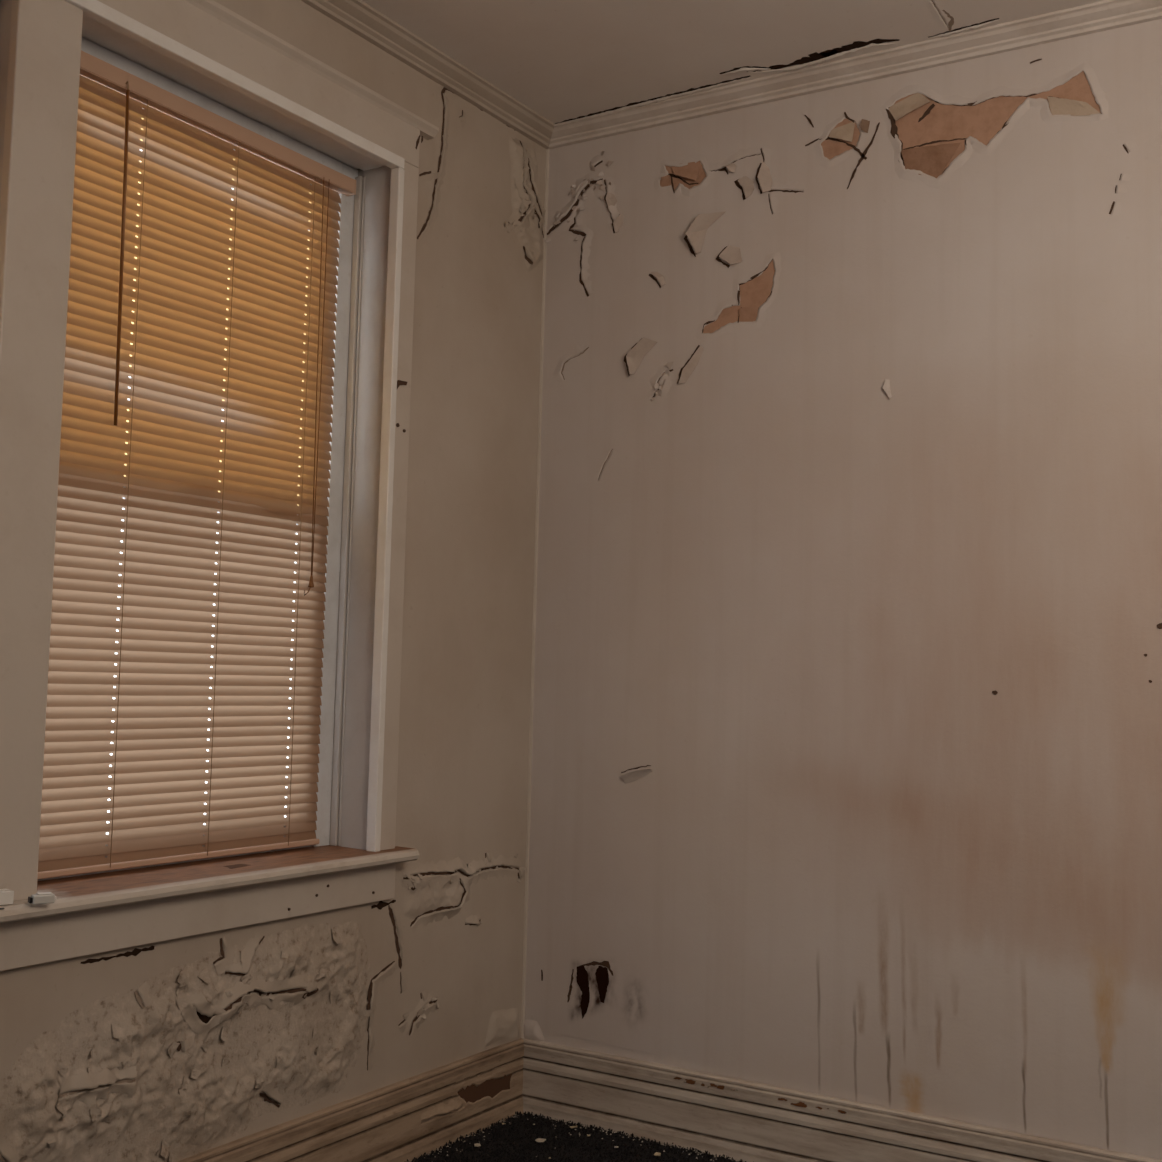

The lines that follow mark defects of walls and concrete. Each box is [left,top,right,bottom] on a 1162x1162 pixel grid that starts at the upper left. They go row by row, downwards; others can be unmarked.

crack [416,83,483,245]
peeling [684,212,725,257]
peeling [654,154,772,200]
crack [555,39,900,124]
peeling [805,62,1109,189]
crack [919,0,1002,39]
peeling [677,245,782,384]
damp [707,308,1162,1159]
crack [367,850,525,1070]
peeling [421,1067,516,1133]